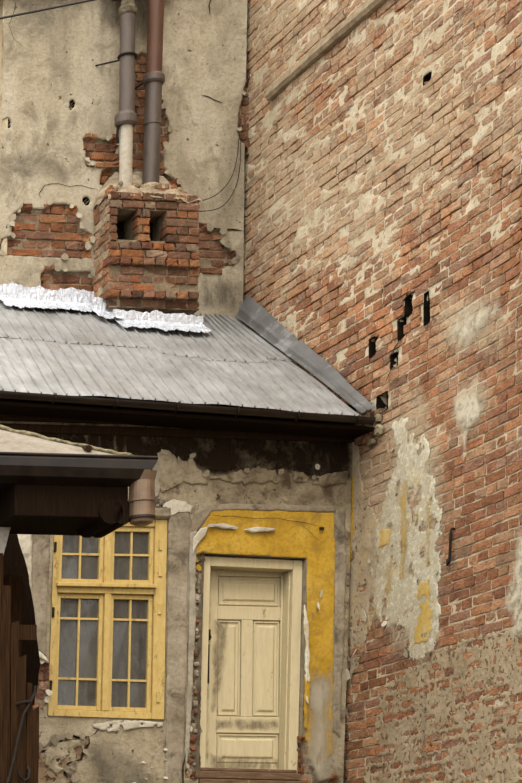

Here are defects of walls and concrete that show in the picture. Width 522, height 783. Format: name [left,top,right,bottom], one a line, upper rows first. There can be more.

spalling [83,133,119,185]
spalling [132,53,147,173]
spalling [159,92,183,191]
spalling [0,203,96,292]
spalling [198,222,240,274]
peeling [17,534,32,593]
spalling [153,418,522,783]
spalling [33,651,53,709]
peeling [93,720,163,732]
spalling [38,732,88,783]